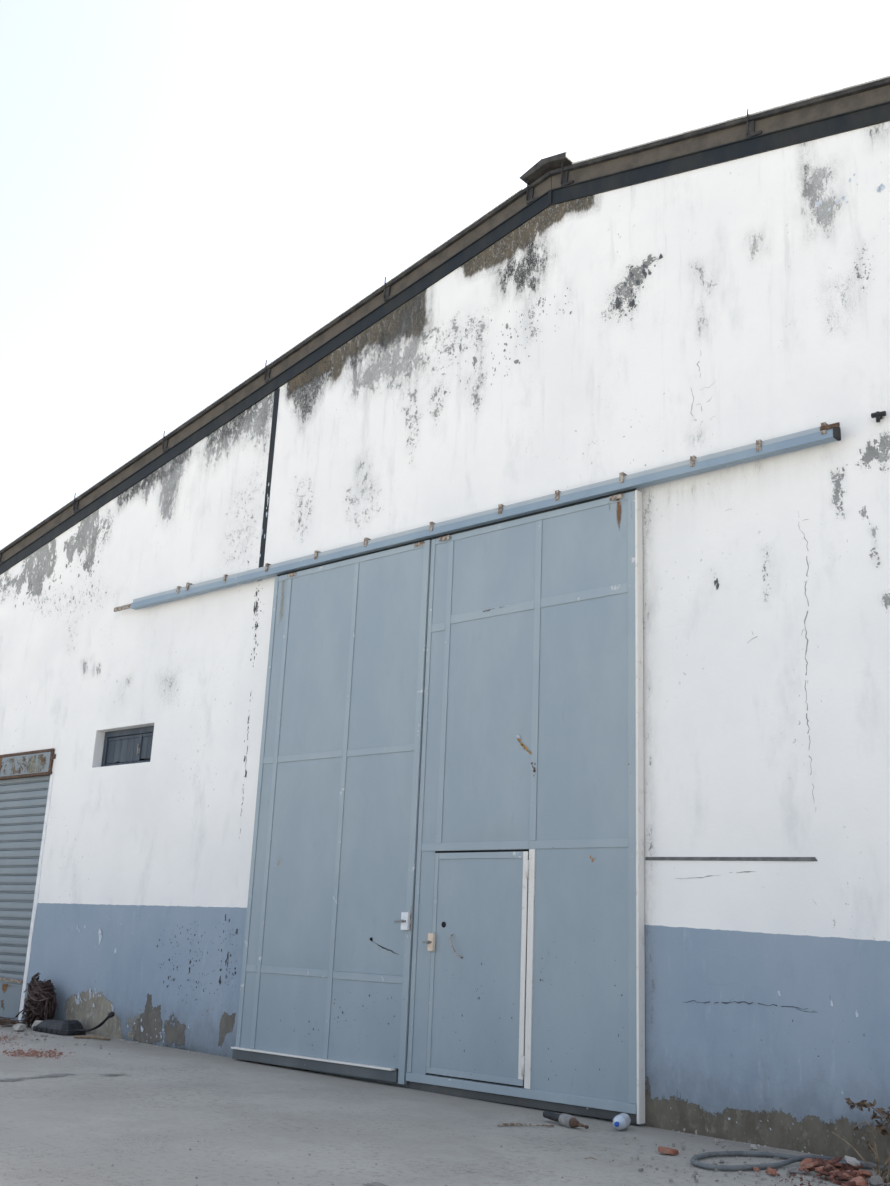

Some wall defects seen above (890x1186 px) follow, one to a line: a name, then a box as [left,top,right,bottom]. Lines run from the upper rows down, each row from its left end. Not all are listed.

water stain [802,166,848,227]
water stain [287,195,594,425]
water stain [117,393,273,519]
crack [798,511,814,798]
rust [0,754,46,775]
peeling [157,914,238,1004]
flaking render [65,988,189,1046]
flaking render [202,1007,236,1047]
water stain [643,1076,890,1166]